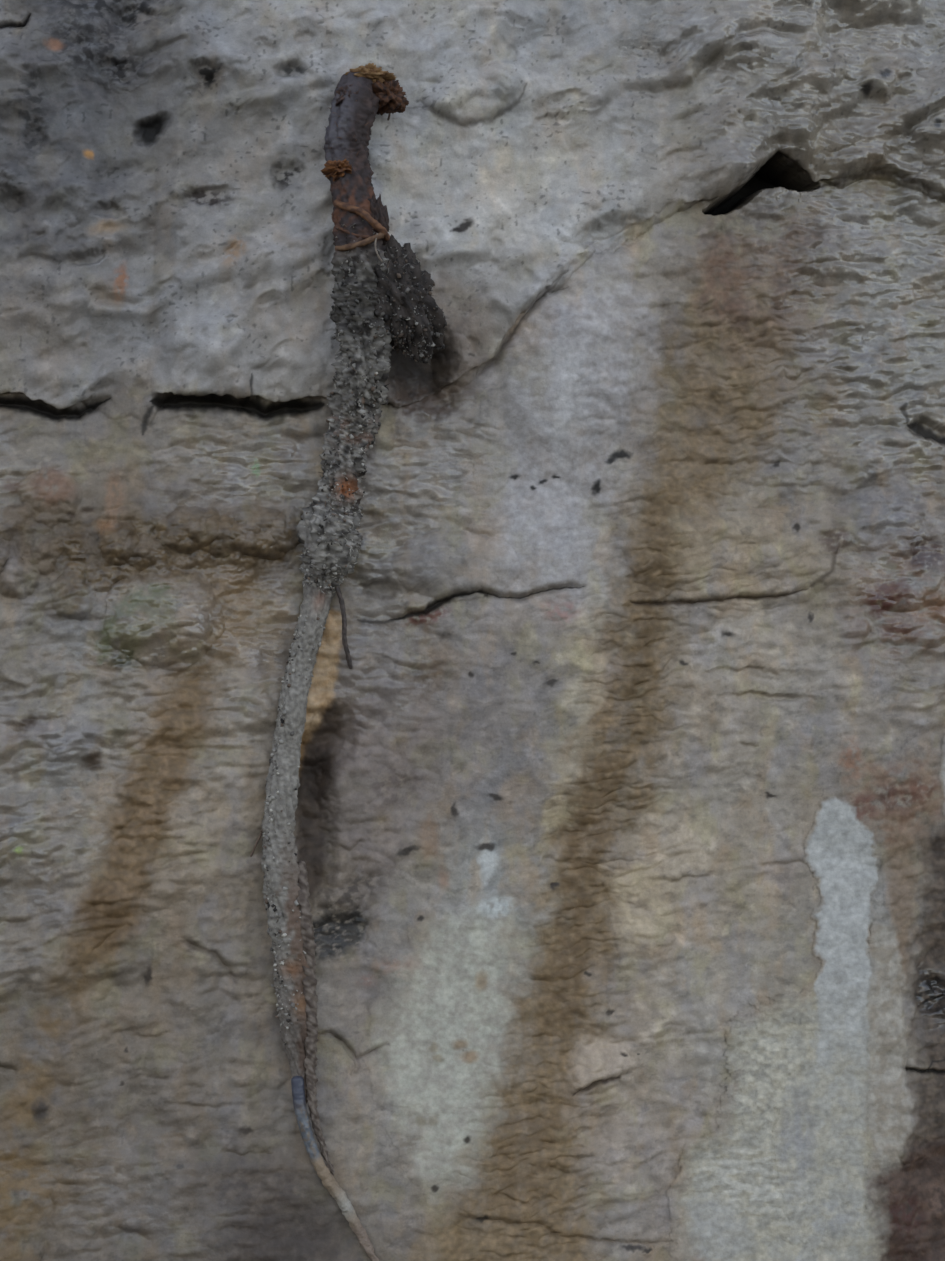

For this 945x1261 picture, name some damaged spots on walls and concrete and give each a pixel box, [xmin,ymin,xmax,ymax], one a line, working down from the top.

damp [275,62,314,79]
damp [269,158,311,194]
crack [815,165,945,204]
crack [477,269,570,378]
crack [0,393,113,426]
crack [140,372,327,437]
crack [355,598,455,626]
corrosion [399,605,456,630]
crack [489,585,586,600]
corrosion [250,63,447,1261]
damp [166,185,854,1261]
damp [666,735,945,1261]